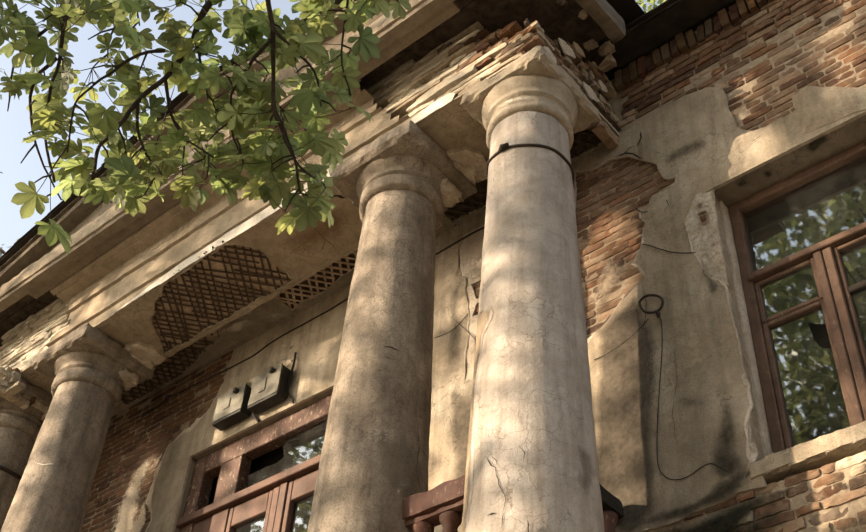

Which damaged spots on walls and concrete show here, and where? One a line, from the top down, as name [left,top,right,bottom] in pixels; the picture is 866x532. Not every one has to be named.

peeling [411,92,455,124]
flaking render [437,0,866,343]
spalling [0,366,49,421]
spalling [81,182,358,532]
spalling [458,224,494,532]
crack [485,456,506,523]
leakage [598,301,745,527]